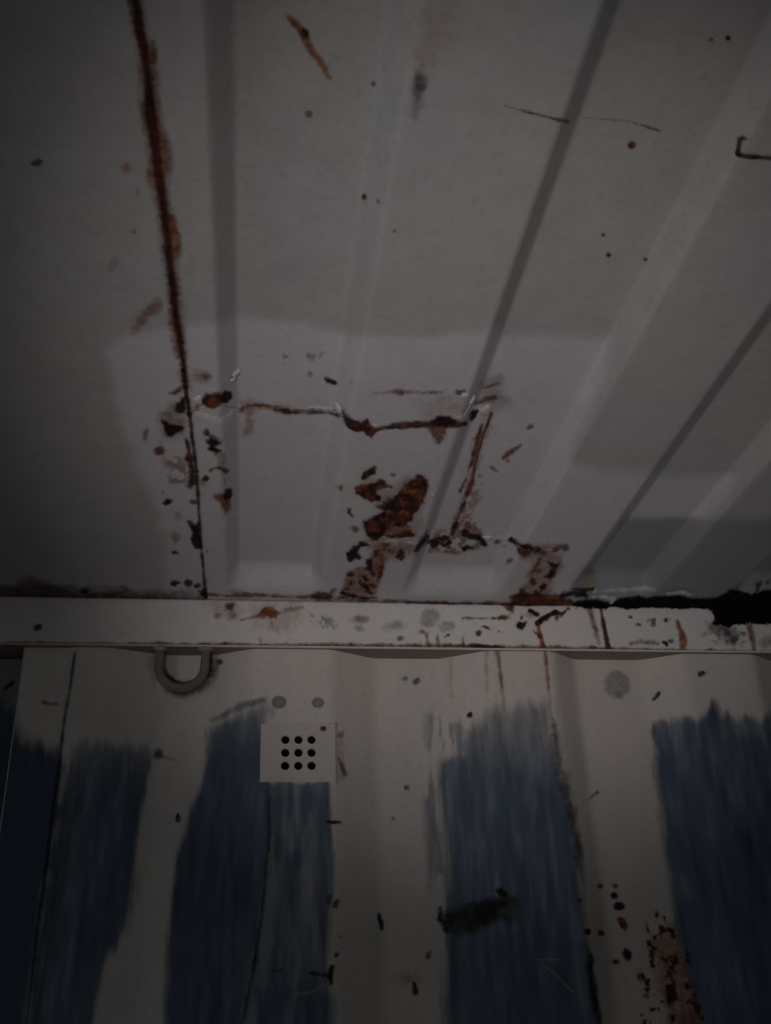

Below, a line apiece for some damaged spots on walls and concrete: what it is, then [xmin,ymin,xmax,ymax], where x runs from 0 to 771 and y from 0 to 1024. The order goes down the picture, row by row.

rust [288,17,330,79]
rust [0,0,283,618]
rust [239,385,771,687]
peeling [592,585,692,604]
rust [638,912,704,1024]